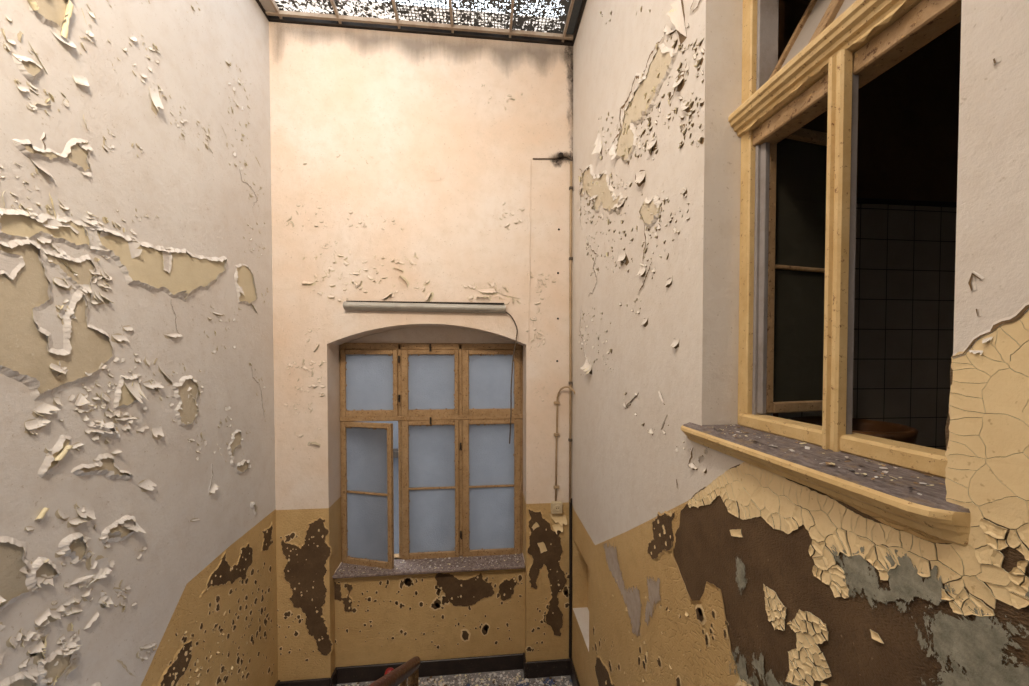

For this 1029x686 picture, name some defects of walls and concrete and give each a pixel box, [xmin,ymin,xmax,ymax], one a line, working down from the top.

peeling [1,15,69,115]
peeling [26,0,264,207]
peeling [578,36,705,231]
peeling [0,115,269,492]
peeling [302,241,434,304]
peeling [463,281,521,305]
crack [952,271,1029,359]
peeling [623,391,669,436]
peeling [645,310,1029,686]
peeling [0,503,146,686]
peeling [117,508,569,686]
peeling [593,627,630,686]